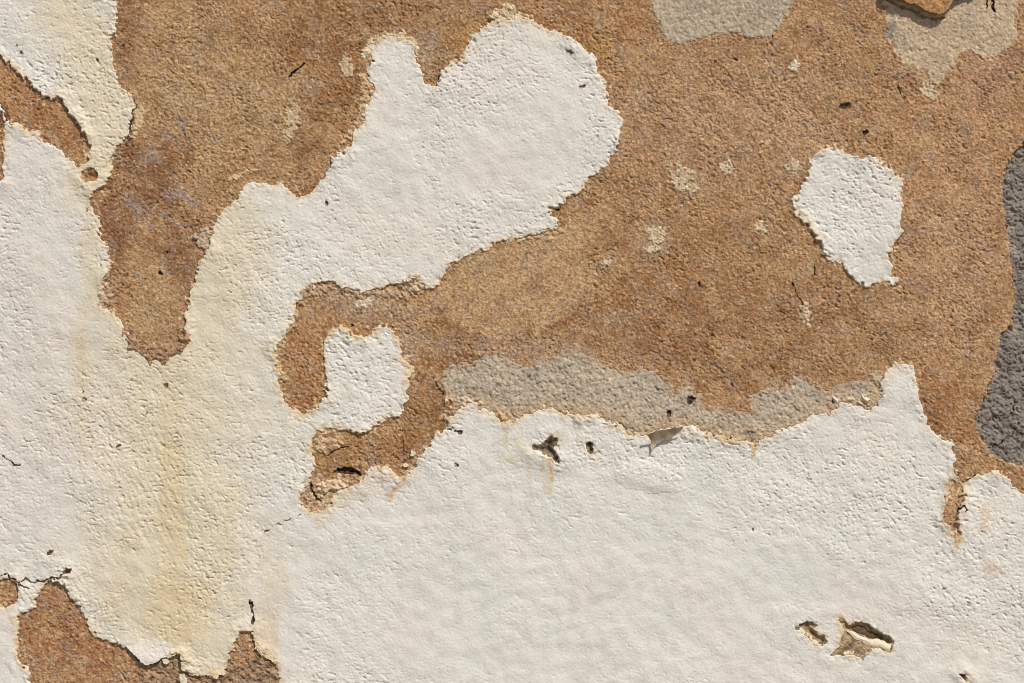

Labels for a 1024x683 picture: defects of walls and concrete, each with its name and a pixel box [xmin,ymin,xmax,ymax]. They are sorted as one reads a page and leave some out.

peeling [0,0,1024,538]
peeling [0,578,279,683]
flaking render [852,625,884,639]